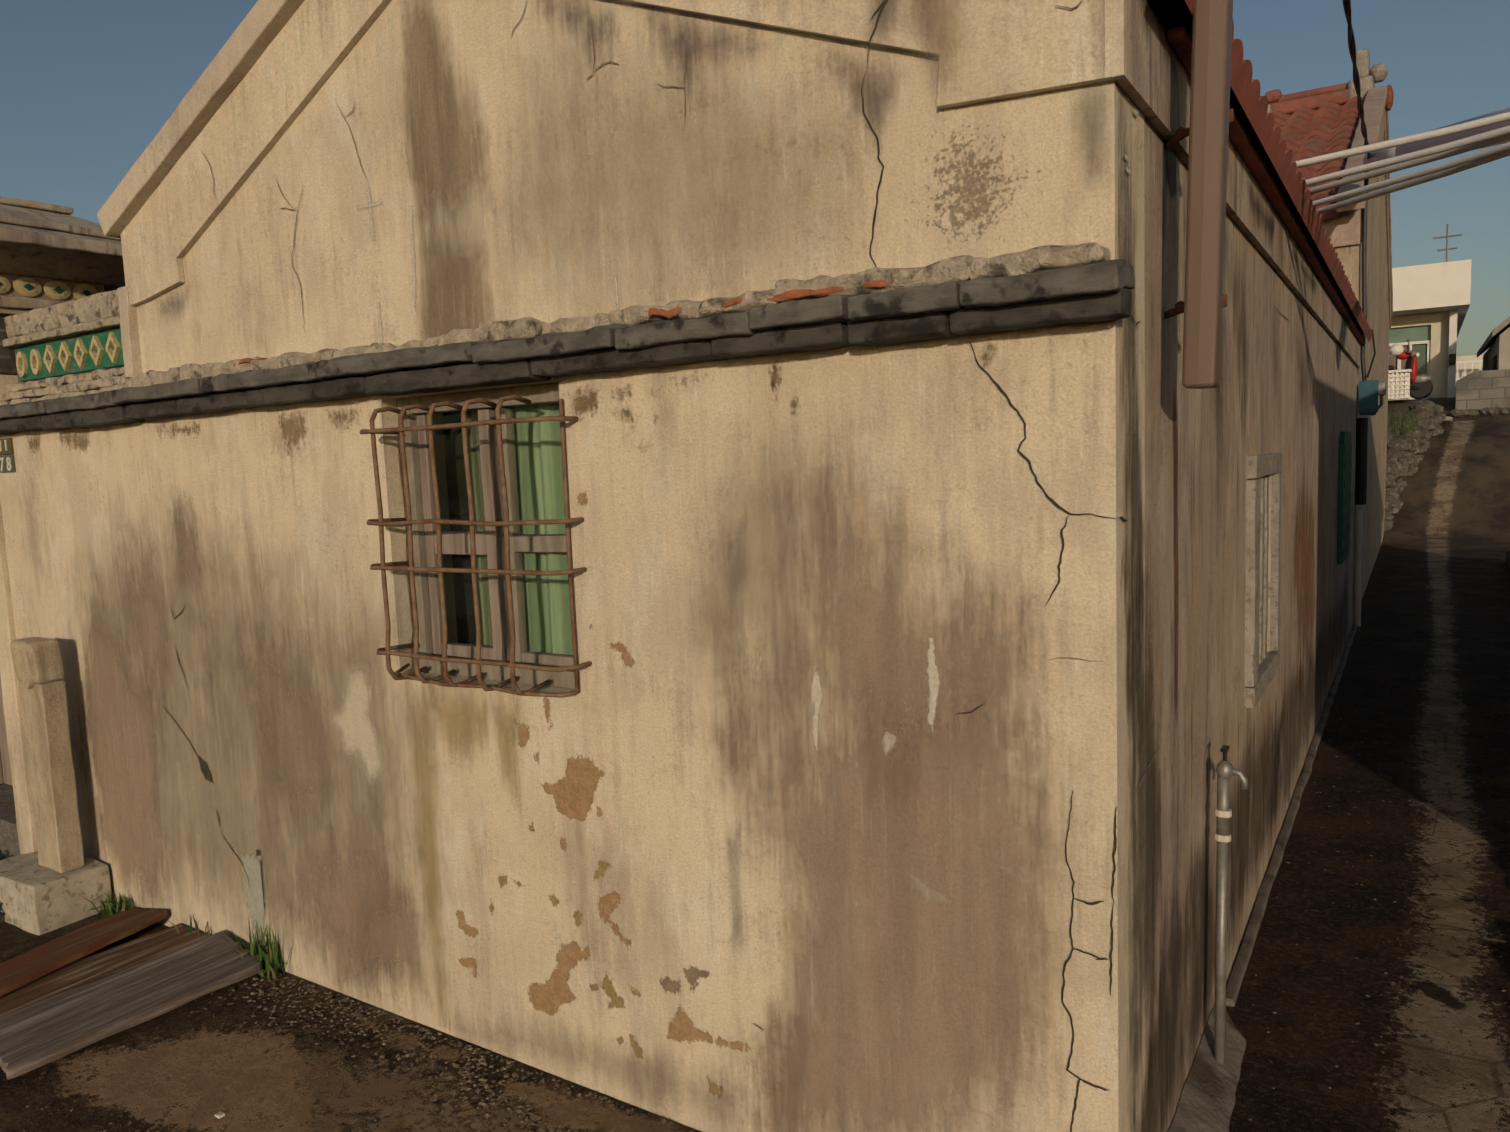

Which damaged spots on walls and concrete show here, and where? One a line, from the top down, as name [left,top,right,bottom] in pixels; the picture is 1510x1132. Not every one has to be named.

water stain [407,10,481,211]
crack [861,0,887,267]
crack [969,342,1129,608]
water stain [88,518,420,978]
spalling [333,671,380,780]
peeling [542,756,605,821]
peeling [528,861,641,1016]
peeling [659,966,750,1051]
water stain [731,502,1045,1132]
crack [1048,655,1096,663]
crack [1061,792,1117,1132]
water stain [1123,288,1281,1132]